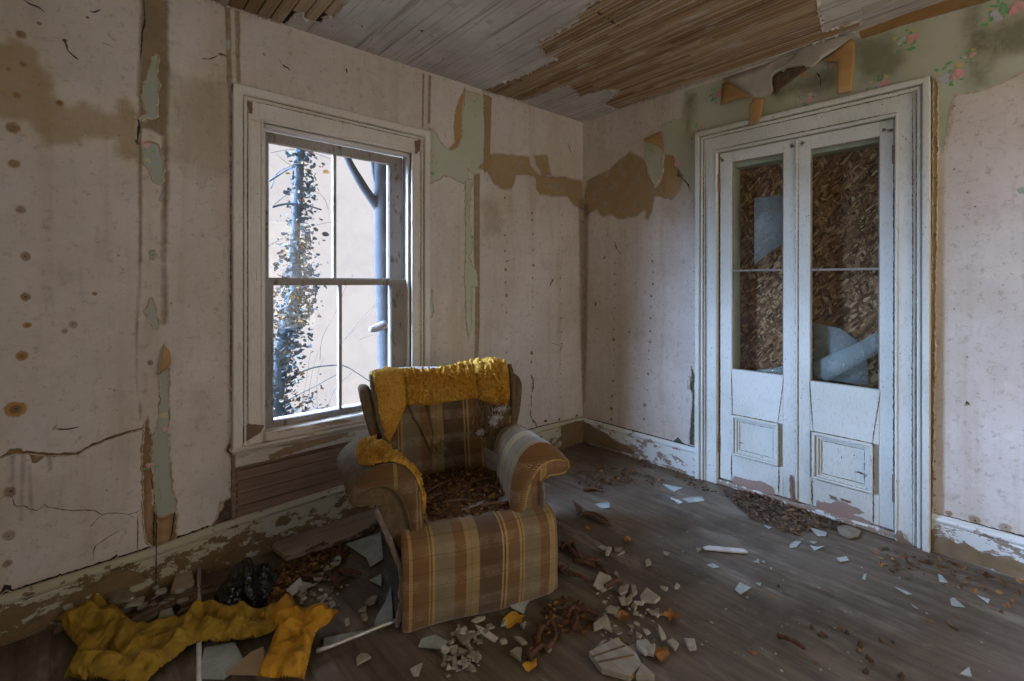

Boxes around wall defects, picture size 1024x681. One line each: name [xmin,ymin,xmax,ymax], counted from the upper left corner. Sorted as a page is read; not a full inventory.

crack [0,421,149,463]
peeling [140,416,179,547]
spalling [209,470,239,527]
peeling [732,476,774,495]
peeling [816,494,872,526]
peeling [931,529,1024,581]
peeling [0,570,189,646]